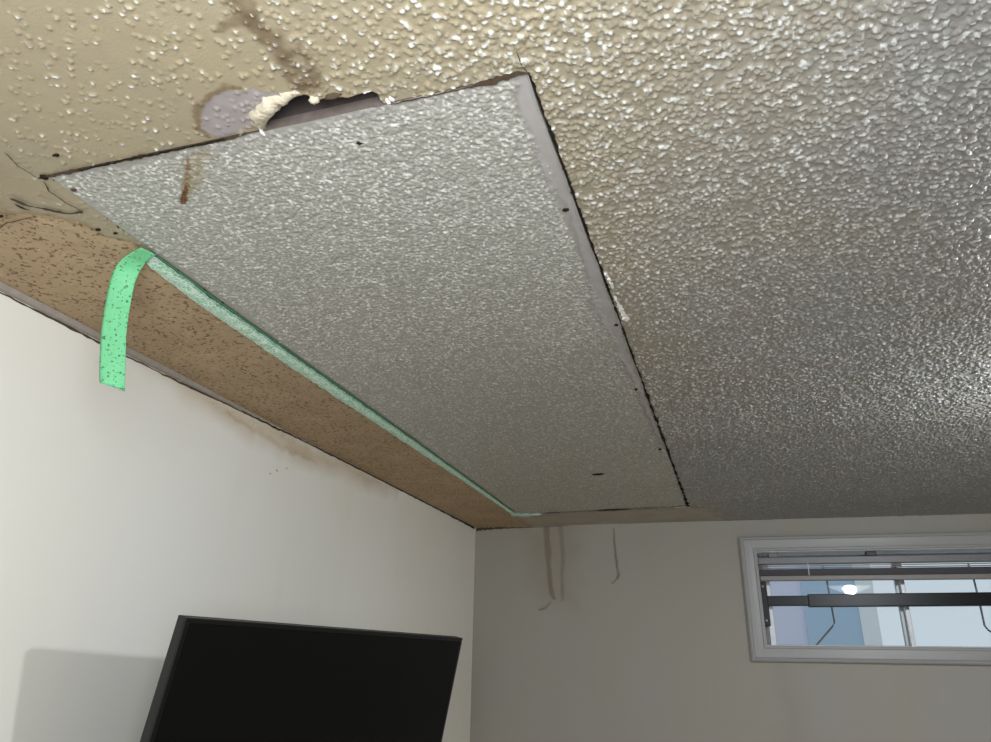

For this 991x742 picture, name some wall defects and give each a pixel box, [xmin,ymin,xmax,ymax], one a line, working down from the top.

peeling [194,86,280,138]
peeling [308,92,361,105]
leakage [0,212,139,333]
leakage [126,263,722,599]